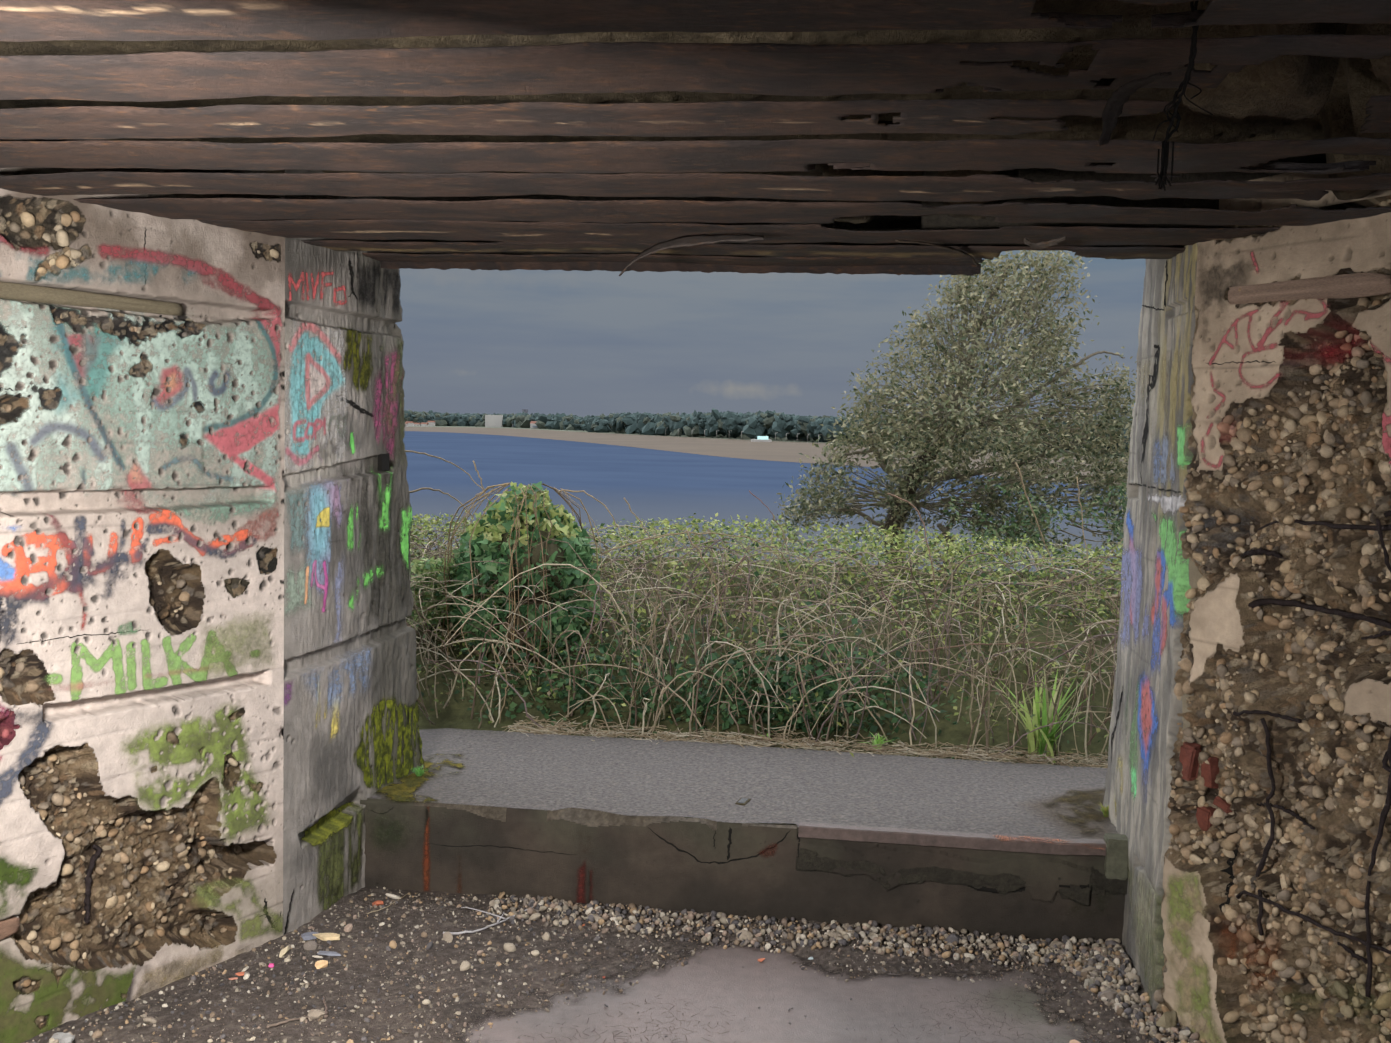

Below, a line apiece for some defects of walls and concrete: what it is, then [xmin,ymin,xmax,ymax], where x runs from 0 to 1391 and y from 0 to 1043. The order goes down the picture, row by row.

spalling [0,196,92,281]
spalling [1224,288,1307,308]
spalling [1318,195,1391,210]
spalling [1335,266,1391,275]
spalling [0,321,63,426]
spalling [145,549,206,636]
spalling [0,649,56,750]
spalling [1164,293,1391,1043]
spalling [9,743,277,995]
crack [649,827,800,864]
crack [475,995,747,1043]
spalling [1154,930,1183,1026]